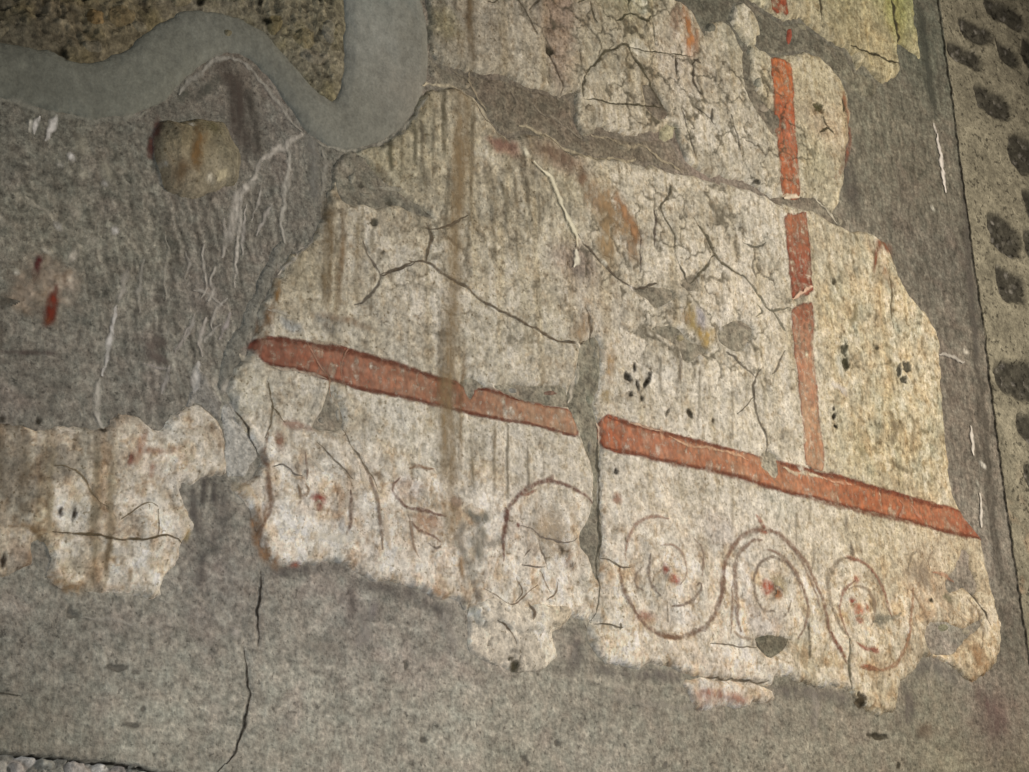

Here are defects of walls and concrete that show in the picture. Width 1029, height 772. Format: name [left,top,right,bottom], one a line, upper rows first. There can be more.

spalling [0,0,346,101]
damp [175,56,427,393]
spalling [331,152,430,217]
damp [422,71,506,478]
crack [354,215,593,344]
damp [519,105,683,174]
crack [578,184,790,452]
spalling [681,0,877,97]
crack [938,0,1029,654]
crack [485,442,630,643]
crack [218,578,262,772]
spalling [755,635,788,658]